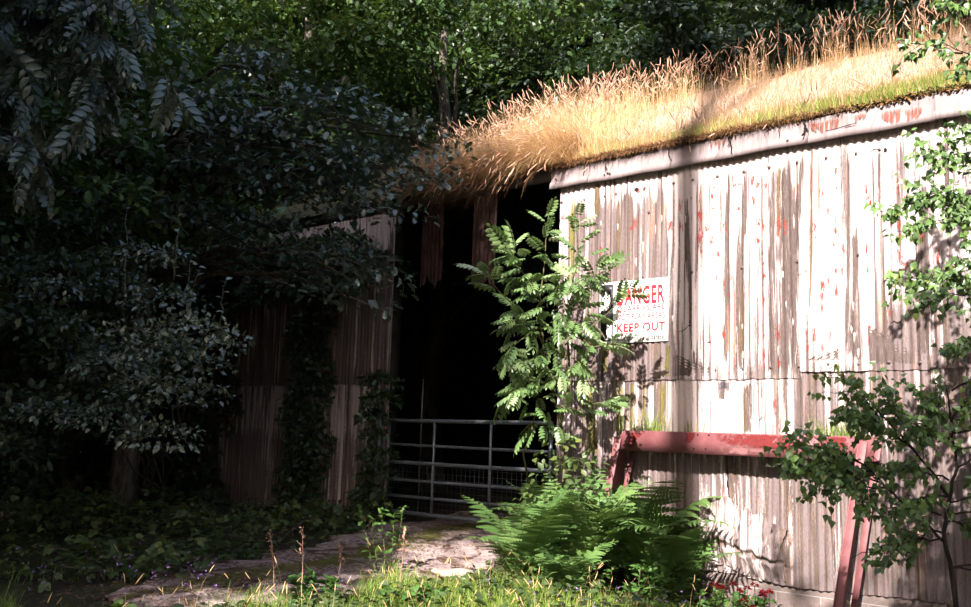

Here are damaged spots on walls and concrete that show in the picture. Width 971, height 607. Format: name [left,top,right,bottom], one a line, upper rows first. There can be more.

corrosion [811,118,839,132]
corrosion [882,107,921,123]
corrosion [818,166,845,253]
corrosion [755,213,788,278]
leakage [768,148,932,429]